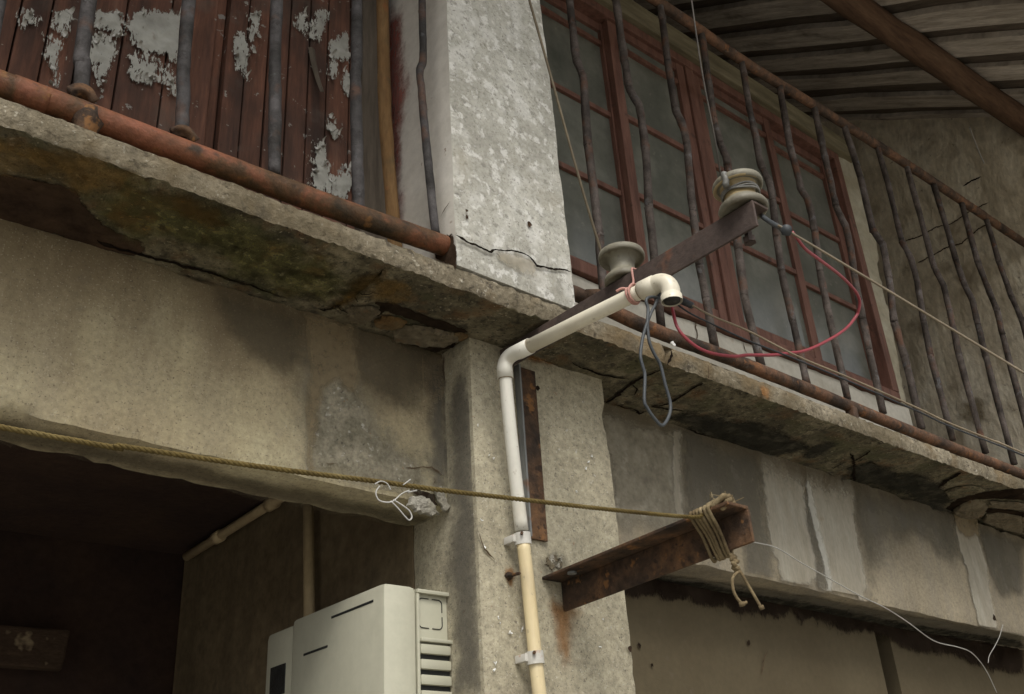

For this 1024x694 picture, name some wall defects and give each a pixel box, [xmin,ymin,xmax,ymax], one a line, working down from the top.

peeling [16,6,75,87]
peeling [90,7,181,97]
peeling [232,10,262,81]
peeling [293,6,351,97]
peeling [309,113,352,199]
crack [443,203,570,272]
crack [906,177,989,263]
spalling [304,302,468,517]
crack [573,351,738,445]
crack [938,472,962,488]
damp [602,411,1024,648]
corrosion [553,606,572,655]